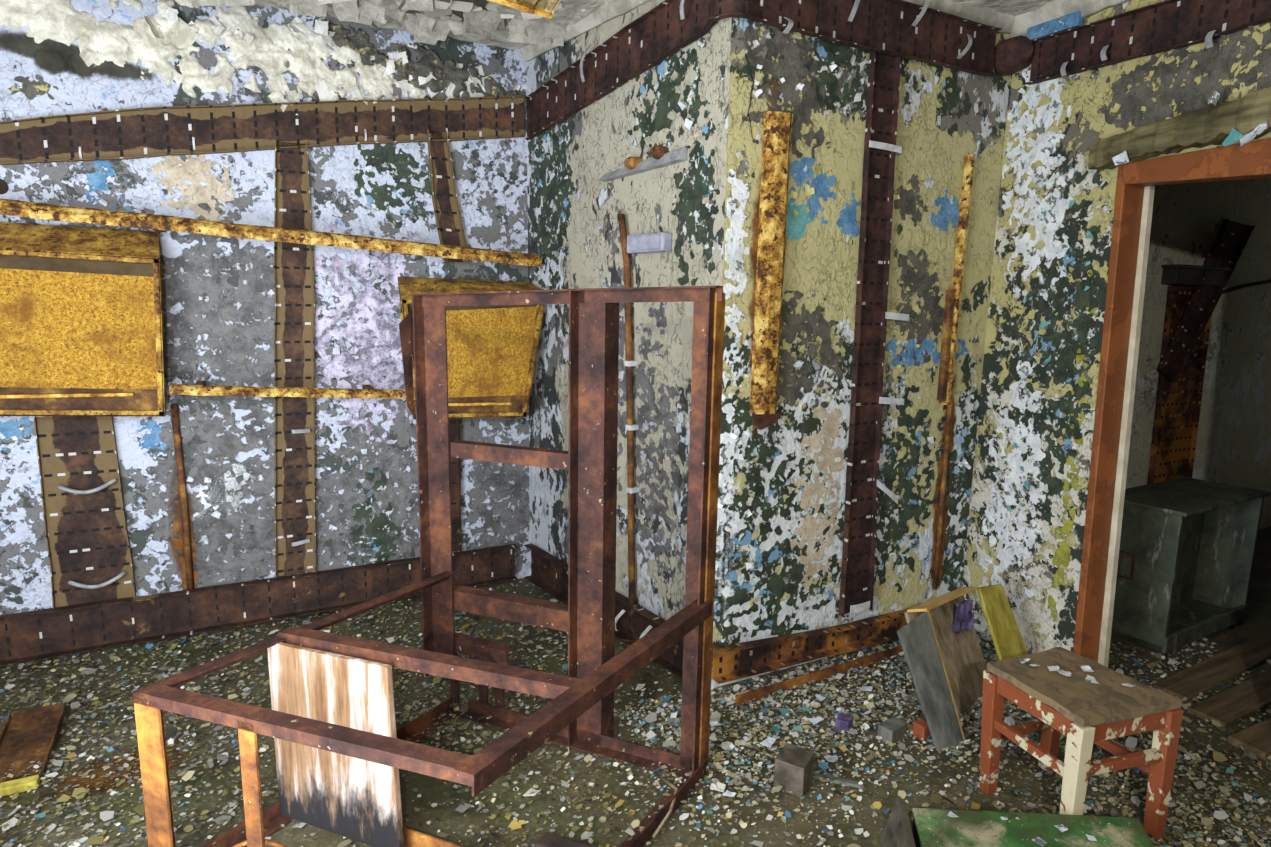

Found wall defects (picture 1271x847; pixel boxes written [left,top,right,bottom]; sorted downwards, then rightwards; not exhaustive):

peeling [138,154,275,588]
flaking render [0,0,586,115]
peeling [313,136,431,568]
peeling [468,460,529,574]
peeling [528,114,575,290]
peeling [617,302,682,577]
peeling [627,37,751,348]
corrosion [749,183,761,364]
peeling [713,290,846,645]
peeling [738,19,869,241]
corrosion [931,379,956,587]
peeling [875,64,1108,622]